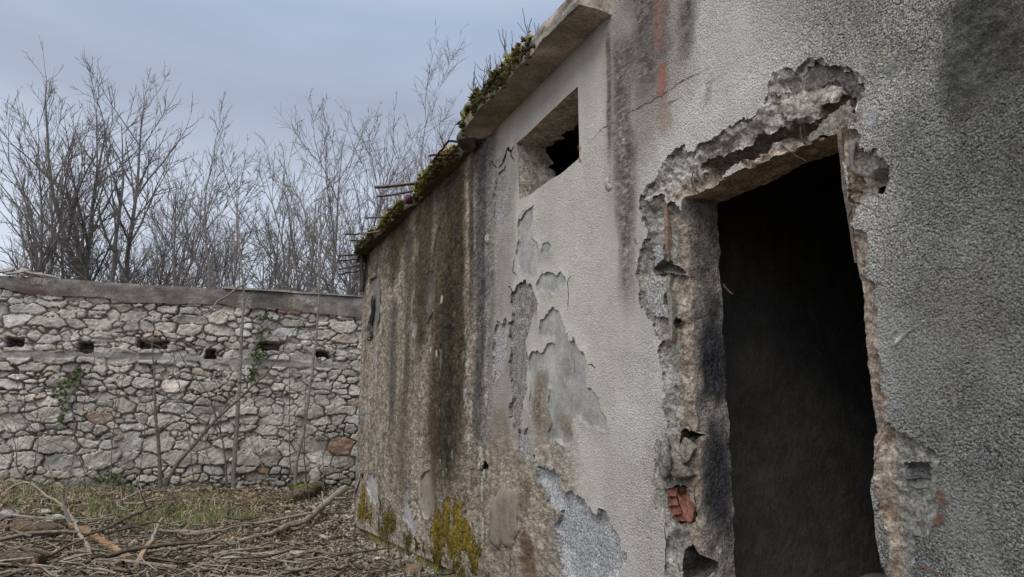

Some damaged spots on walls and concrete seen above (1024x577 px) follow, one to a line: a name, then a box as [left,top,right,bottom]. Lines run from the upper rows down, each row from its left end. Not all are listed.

water stain [606,0,667,281]
crack [603,68,707,135]
water stain [680,0,693,49]
water stain [389,158,485,486]
flaking render [461,165,627,577]
spalling [635,57,940,577]